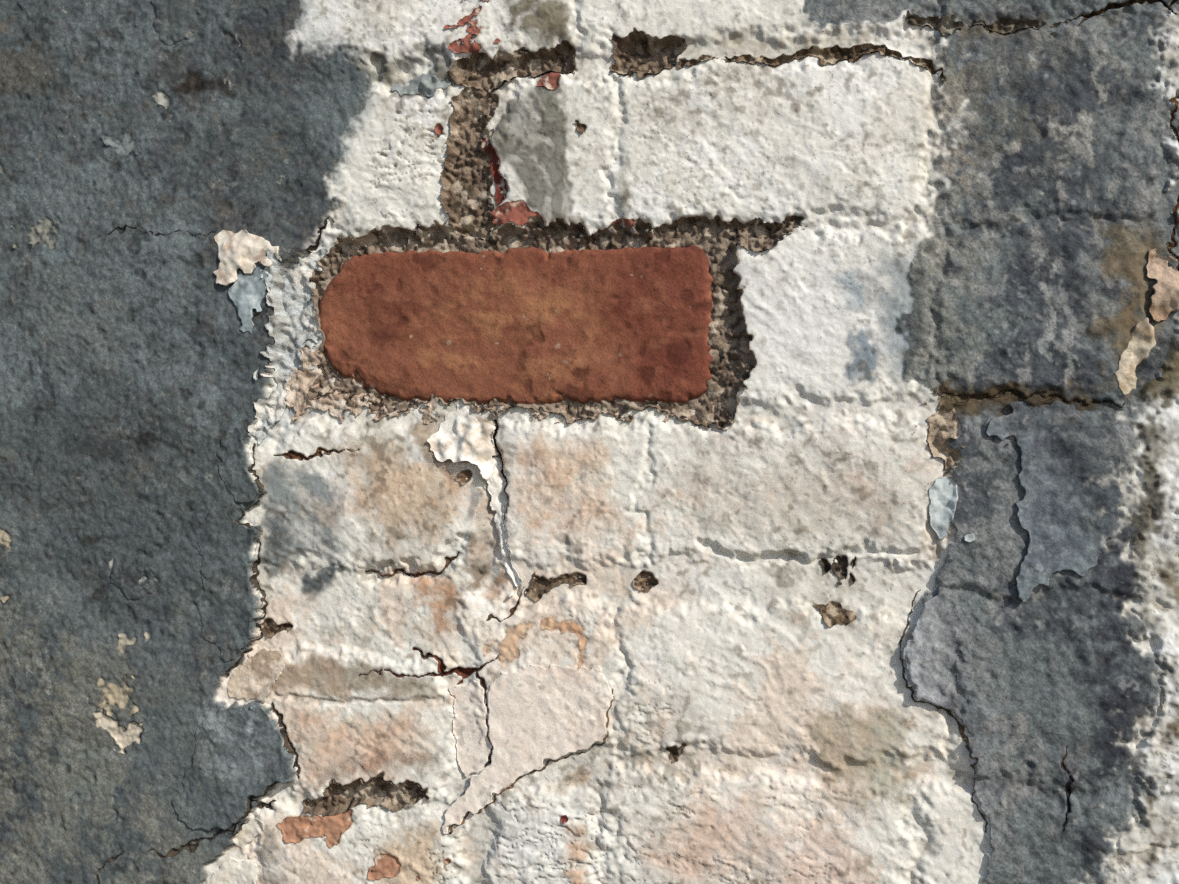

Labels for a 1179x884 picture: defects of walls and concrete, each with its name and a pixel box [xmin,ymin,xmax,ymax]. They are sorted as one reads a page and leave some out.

peeling [390,73,451,97]
crack [1071,0,1178,26]
spalling [213,128,807,597]
peeling [1115,248,1179,396]
crack [226,443,359,678]
crack [366,551,460,577]
crack [487,587,524,622]
spalling [913,386,966,539]
leakage [1134,425,1164,556]
peeling [172,508,429,884]
crack [359,647,499,767]
crack [442,689,614,836]